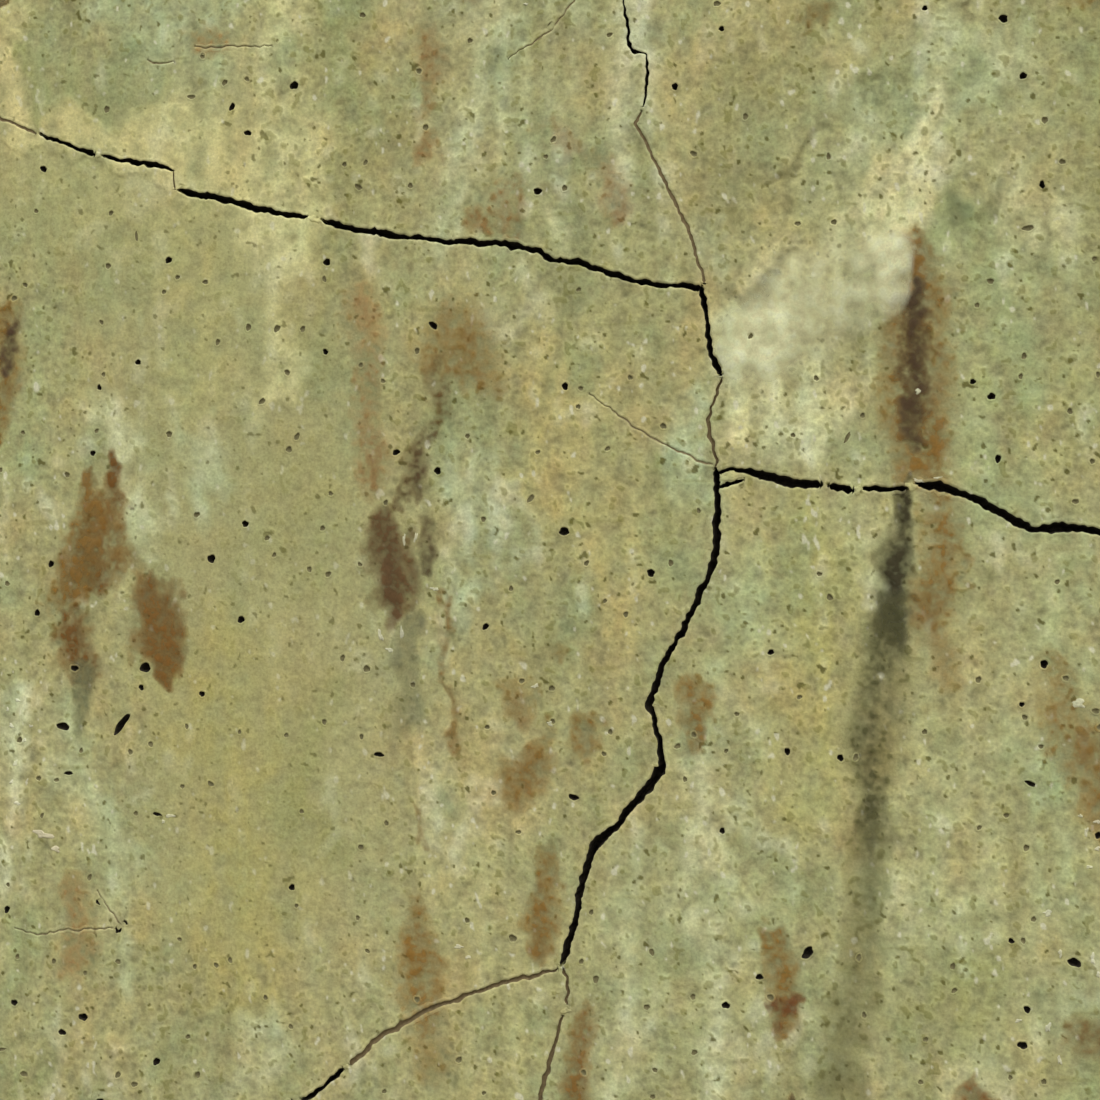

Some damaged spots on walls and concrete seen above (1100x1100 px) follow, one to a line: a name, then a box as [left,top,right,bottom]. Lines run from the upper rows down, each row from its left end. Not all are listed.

crack [146,42,272,68]
crack [0,111,308,223]
rust [0,301,18,445]
rust [882,227,953,481]
rust [52,451,127,682]
rust [134,575,185,690]
rust [368,437,437,626]
crack [284,0,1100,1100]
leakage [851,477,942,860]
rust [1050,688,1100,810]
crack [15,889,126,939]